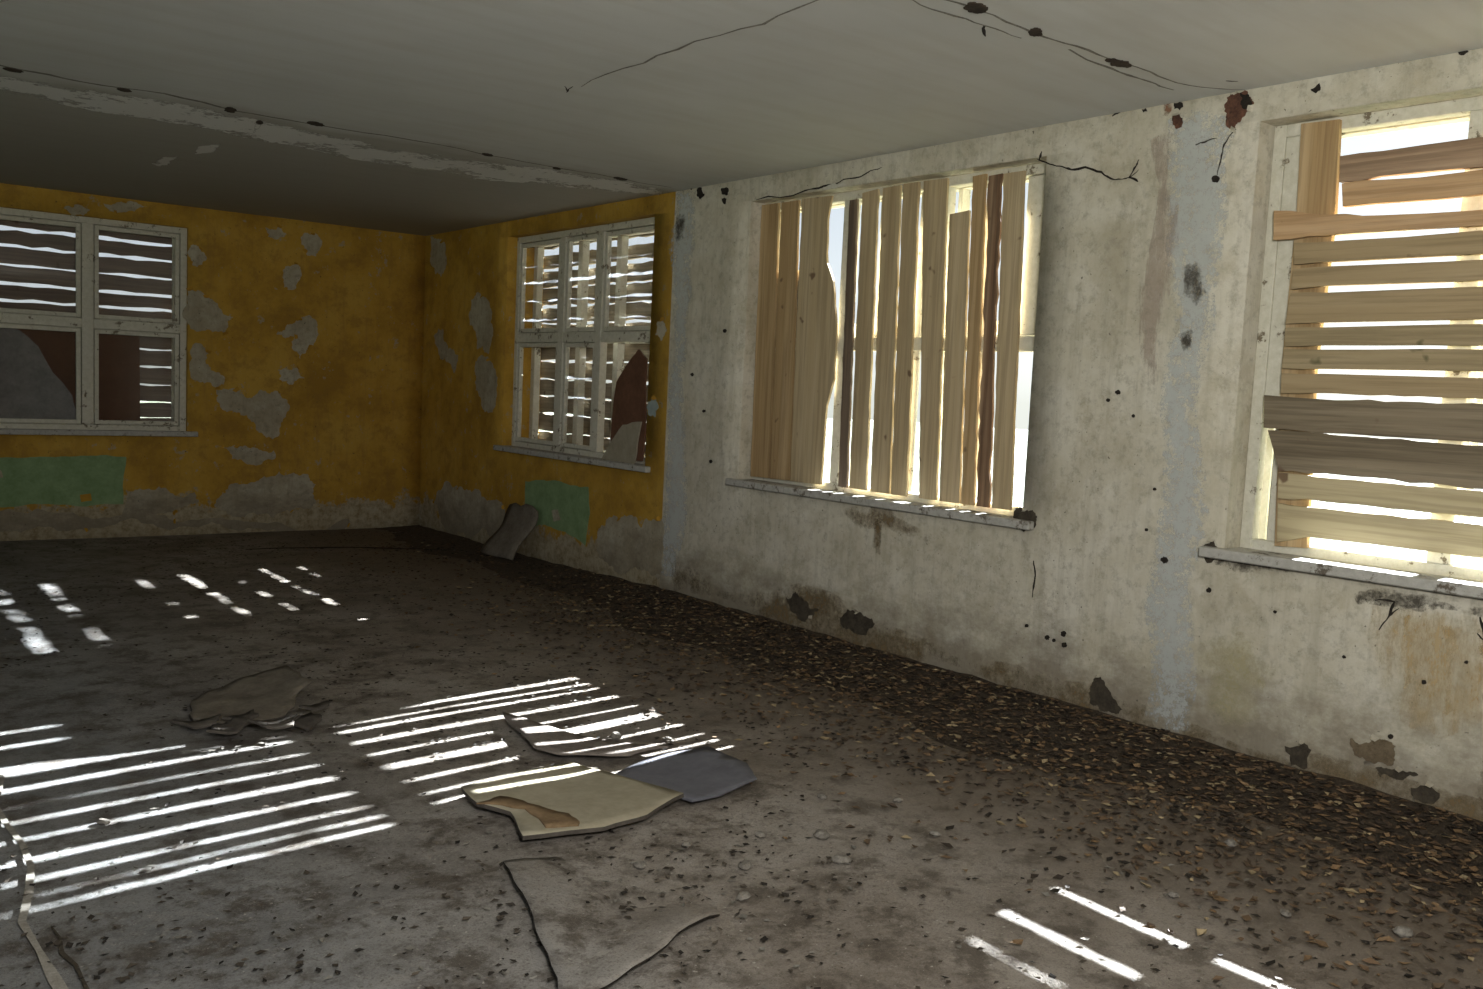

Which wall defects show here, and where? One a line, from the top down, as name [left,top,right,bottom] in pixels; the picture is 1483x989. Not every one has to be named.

crack [564,0,818,92]
crack [913,0,1238,90]
crack [1037,151,1139,182]
crack [1196,129,1236,183]
peeling [265,224,322,290]
peeling [434,292,498,413]
peeling [122,286,318,518]
peeling [433,481,505,539]
peeling [596,515,665,579]
damp [1356,590,1453,706]